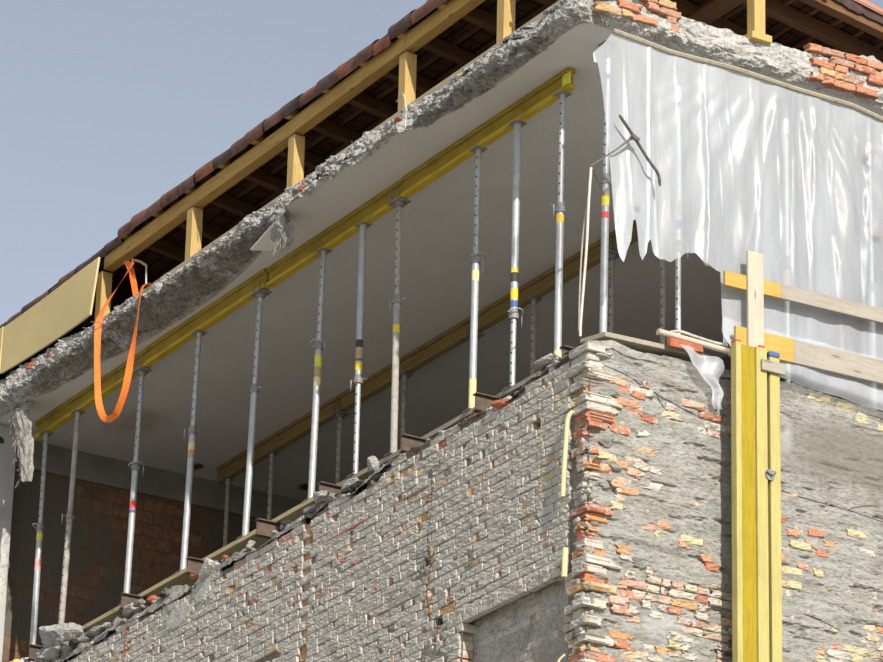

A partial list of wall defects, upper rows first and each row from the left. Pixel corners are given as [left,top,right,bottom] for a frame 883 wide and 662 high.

flaking render [592,0,682,33]
spalling [394,34,553,134]
flaking render [803,42,883,101]
flaking render [607,377,654,424]
flaking render [595,451,639,496]
flaking render [0,541,10,604]
flaking render [643,520,720,573]
flaking render [781,515,835,590]